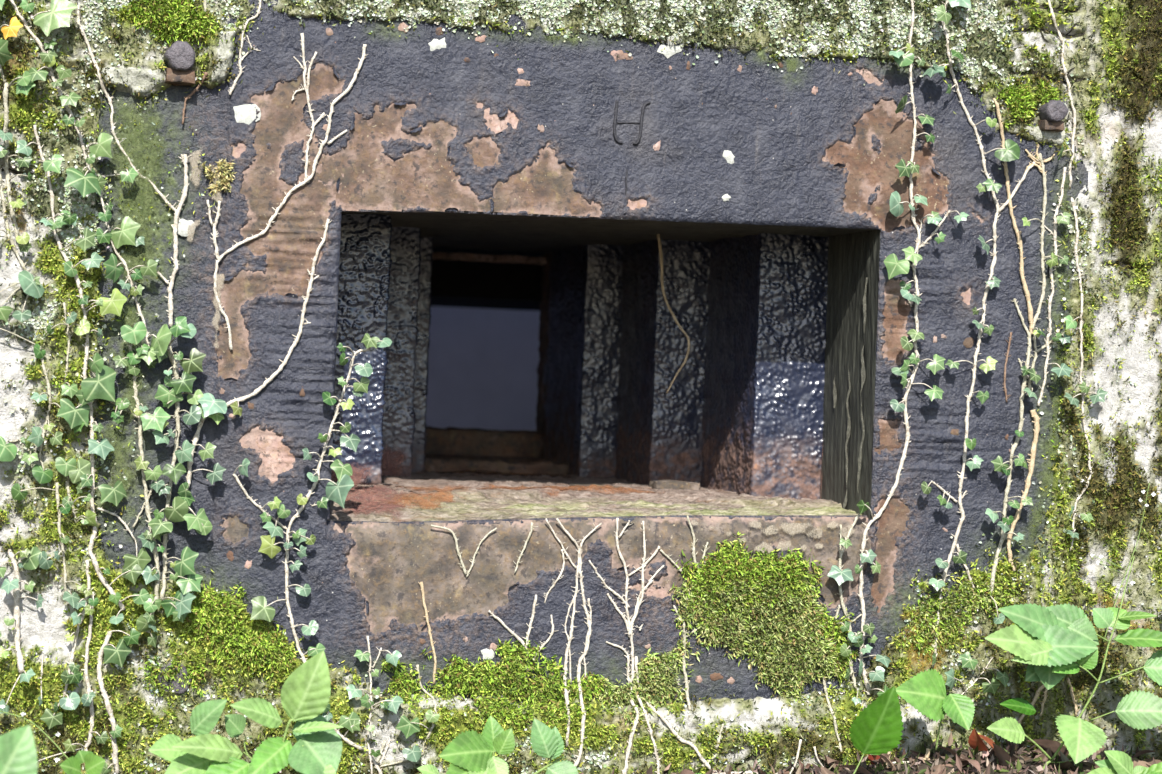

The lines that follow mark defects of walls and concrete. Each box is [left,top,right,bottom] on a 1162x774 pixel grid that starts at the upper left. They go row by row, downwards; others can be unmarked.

peeling [848,68,884,85]
peeling [215,63,602,394]
peeling [822,99,949,232]
peeling [239,425,295,483]
rust [331,449,701,516]
peeling [333,498,910,644]